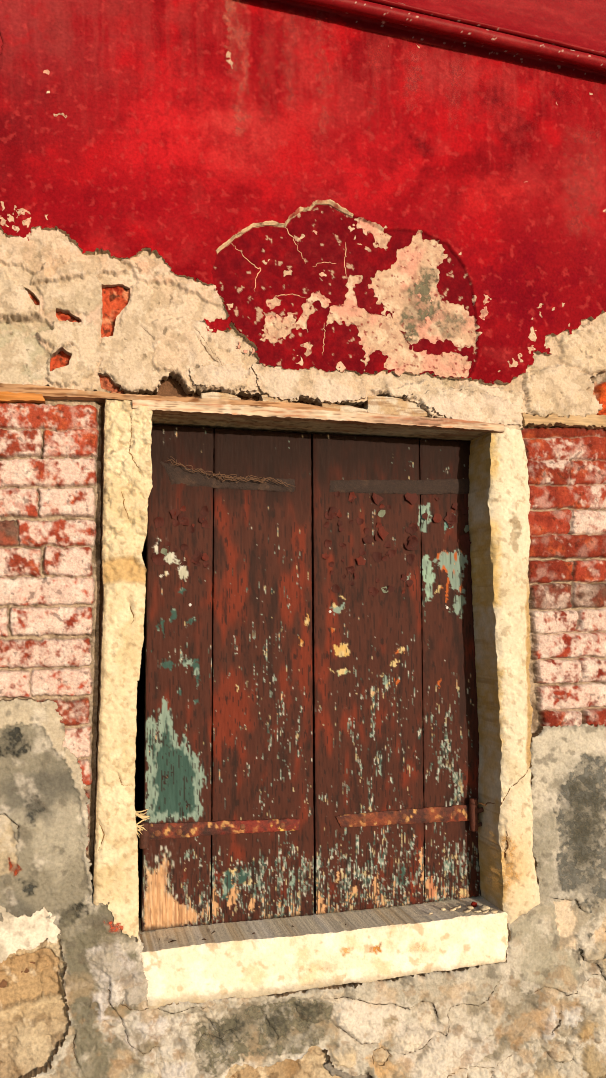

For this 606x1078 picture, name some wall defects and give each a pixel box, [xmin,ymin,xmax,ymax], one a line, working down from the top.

peeling [0,201,31,232]
flaking render [101,286,130,338]
crack [235,247,305,298]
crack [285,227,347,279]
flaking render [50,351,71,371]
flaking render [189,199,606,734]
flaking render [0,399,101,884]
leakage [0,727,31,757]
leakage [553,753,606,913]
flaking render [0,939,70,1078]
crack [334,982,499,1066]
crack [535,948,606,1063]